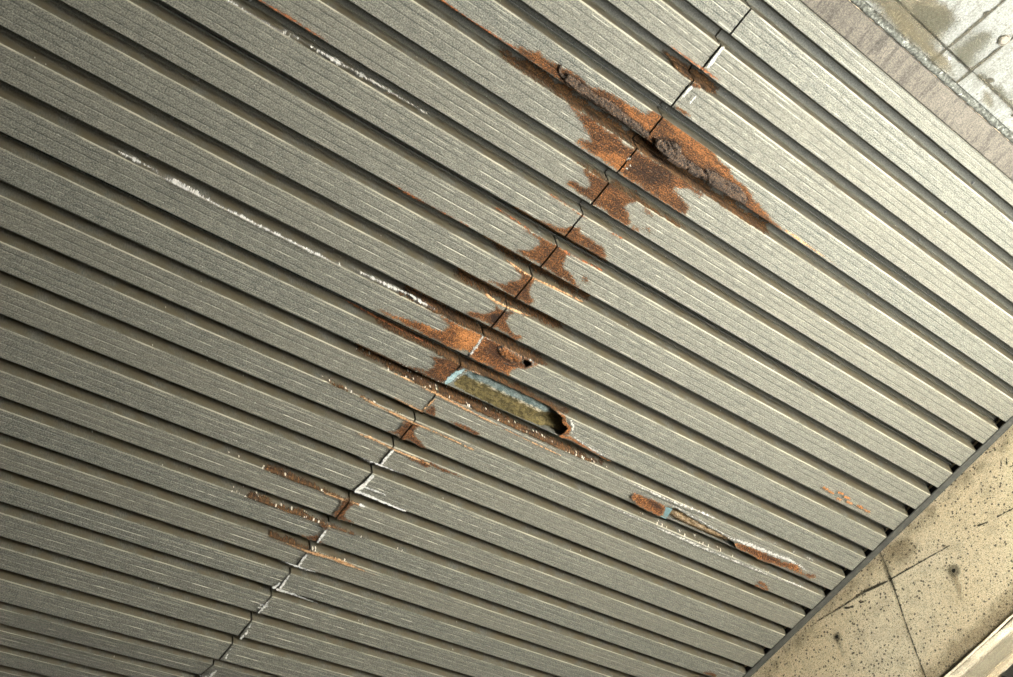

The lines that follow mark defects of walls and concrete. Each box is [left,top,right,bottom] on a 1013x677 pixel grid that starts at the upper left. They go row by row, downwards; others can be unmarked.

rust [441,0,824,256]
rust [314,194,611,477]
spalling [454,365,568,433]
rust [231,464,369,573]
rust [735,542,816,579]
crack [817,545,950,677]